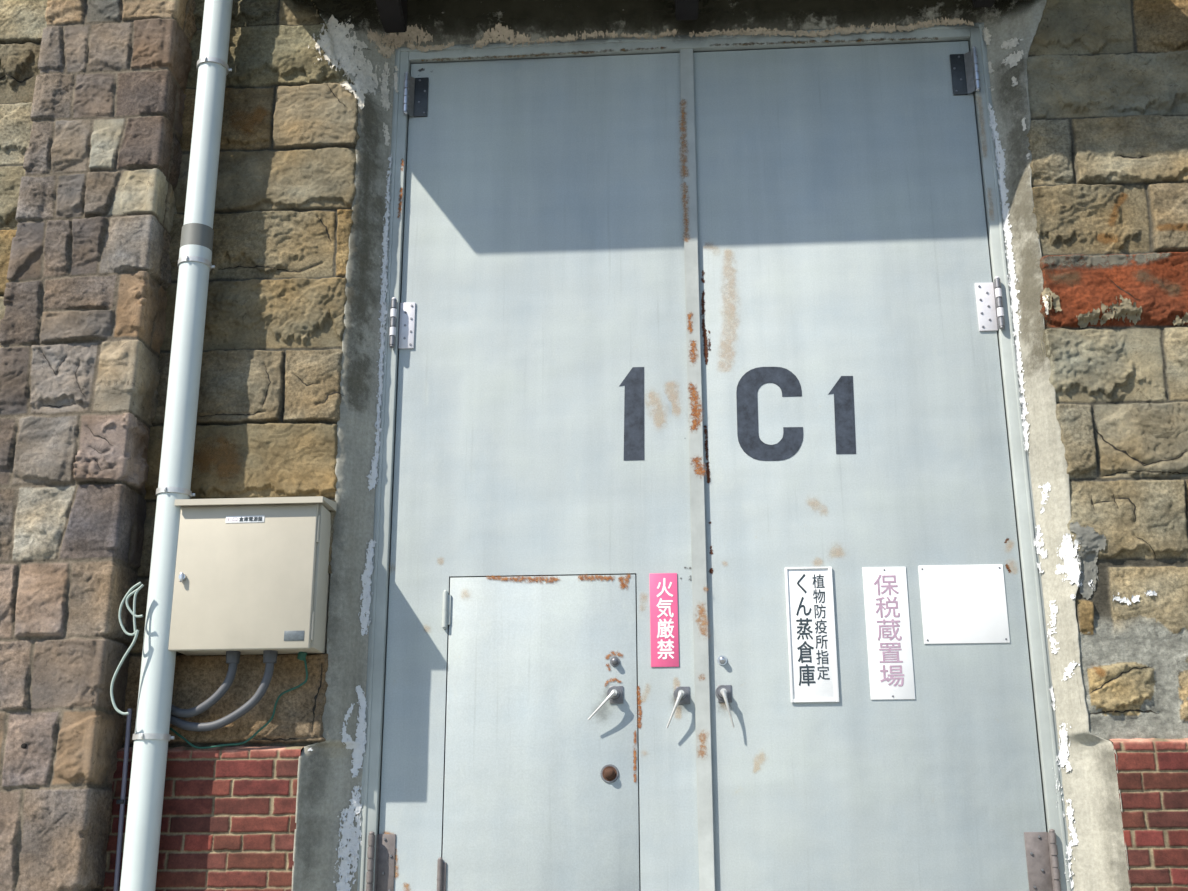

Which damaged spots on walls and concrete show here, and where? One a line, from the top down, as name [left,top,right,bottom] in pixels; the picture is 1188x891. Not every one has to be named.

corrosion [680,100,688,240]
peeling [308,15,454,491]
corrosion [688,270,711,365]
peeling [470,17,1030,451]
spalling [1041,288,1062,315]
corrosion [689,384,710,483]
corrosion [578,574,631,589]
peeling [1033,482,1107,600]
peeling [1113,590,1157,605]
peeling [333,685,368,891]
corrosion [633,686,642,782]
peeling [1052,722,1079,889]